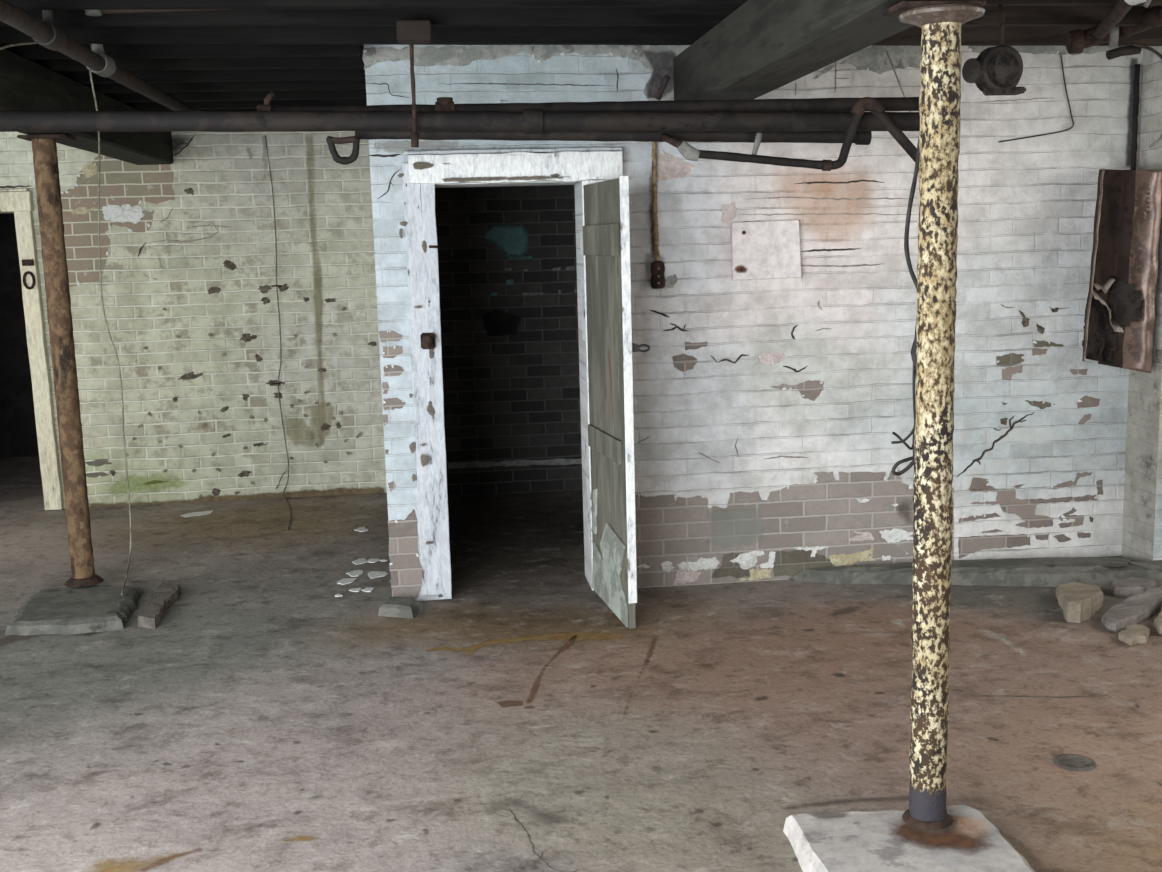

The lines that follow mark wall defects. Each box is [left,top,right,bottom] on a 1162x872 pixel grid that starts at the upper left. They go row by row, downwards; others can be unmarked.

flaking render [61,156,194,287]
flaking render [368,330,406,425]
crack [957,412,1034,477]
flaking render [635,469,914,588]
flaking render [951,472,1103,560]
corrosion [892,815,985,851]